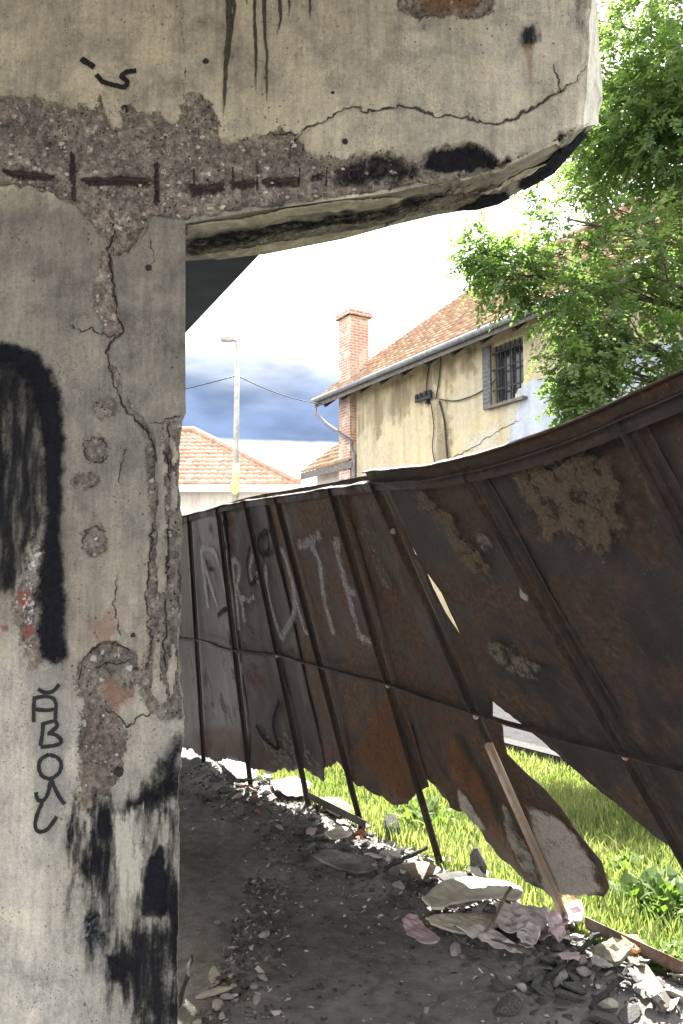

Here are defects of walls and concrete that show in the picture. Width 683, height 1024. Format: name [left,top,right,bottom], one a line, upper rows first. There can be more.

spalling [0,91,546,337]
crack [267,64,586,158]
spalling [397,0,495,21]
corrosion [521,25,541,46]
crack [69,209,180,483]
spalling [70,366,183,914]